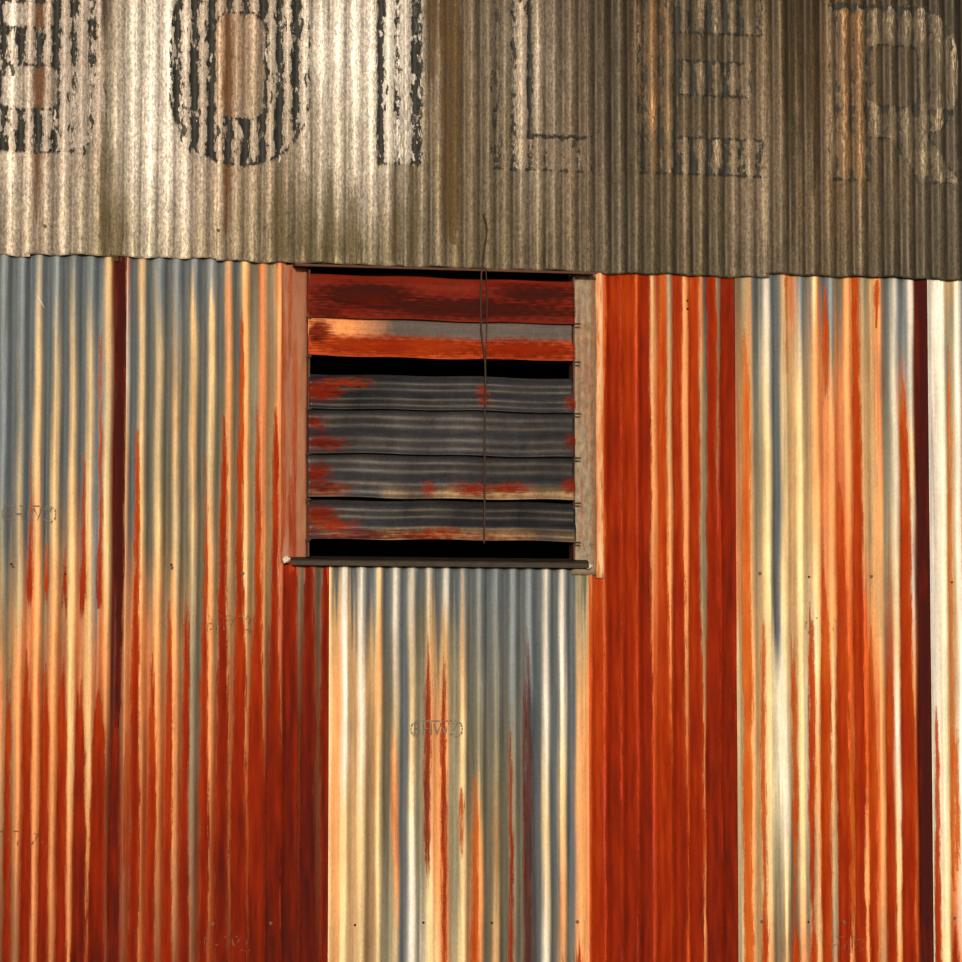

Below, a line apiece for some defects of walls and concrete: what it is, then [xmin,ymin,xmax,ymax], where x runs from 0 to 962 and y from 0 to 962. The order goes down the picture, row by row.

peeling [0,0,108,155]
peeling [169,0,311,167]
peeling [376,0,424,167]
peeling [489,0,592,173]
peeling [636,0,765,179]
peeling [827,2,961,184]
rust [309,279,576,360]
rust [2,256,360,962]
rust [576,273,770,962]
rust [790,276,961,962]
rust [423,643,479,962]
rust [507,735,515,962]